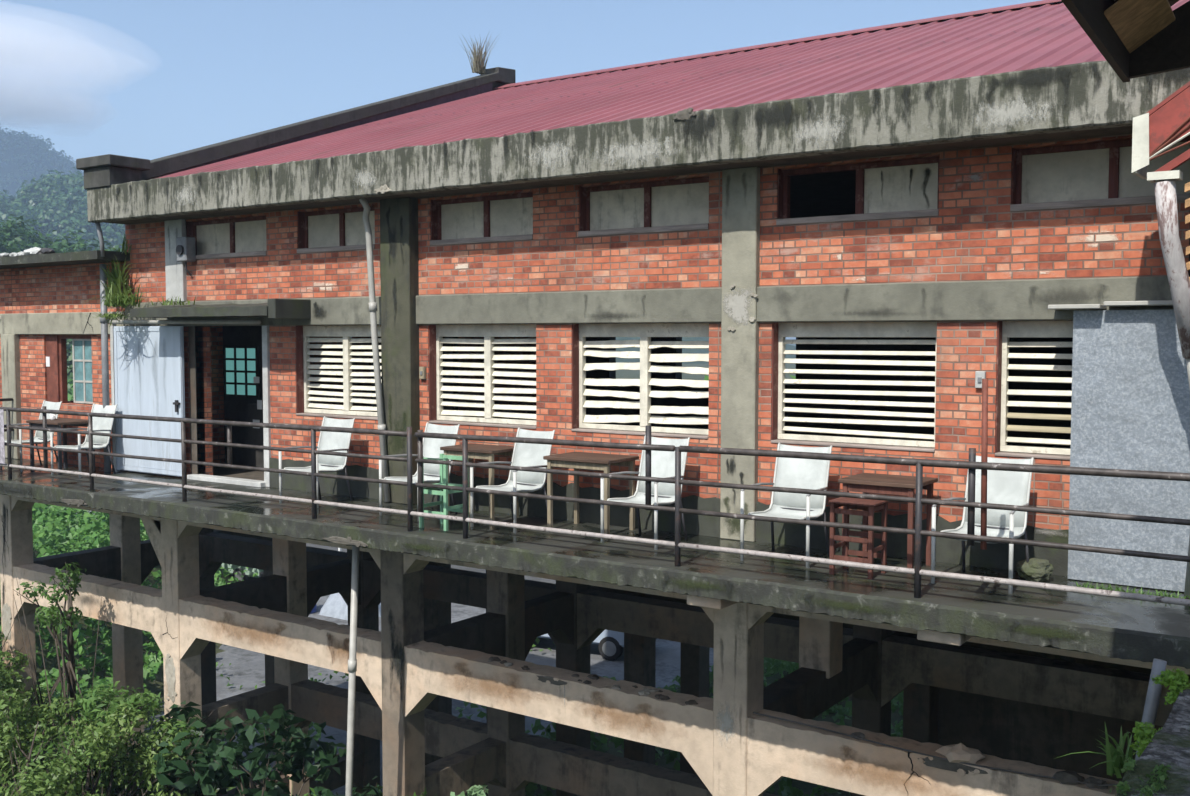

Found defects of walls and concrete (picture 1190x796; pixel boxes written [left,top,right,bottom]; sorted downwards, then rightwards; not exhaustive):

leakage [902,85,911,112]
leakage [978,68,1070,123]
leakage [1091,64,1101,88]
leakage [1147,68,1190,92]
leakage [683,113,717,146]
leakage [754,100,839,147]
leakage [531,130,565,166]
leakage [605,138,669,159]
peeling [723,285,758,331]
crack [903,752,931,793]
spalling [918,756,988,776]